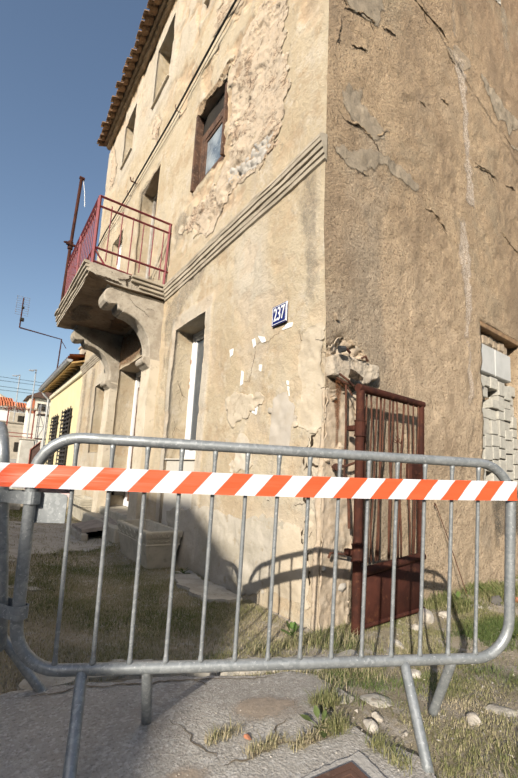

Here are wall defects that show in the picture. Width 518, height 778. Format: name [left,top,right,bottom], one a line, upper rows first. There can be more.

crack [334,4,376,53]
peeling [344,0,396,36]
crack [415,0,451,48]
spalling [178,0,291,239]
peeling [339,83,387,140]
crack [348,116,388,152]
leakage [453,52,474,206]
crack [474,161,515,190]
crack [425,204,447,232]
spalling [225,371,273,428]
peeling [292,322,367,477]